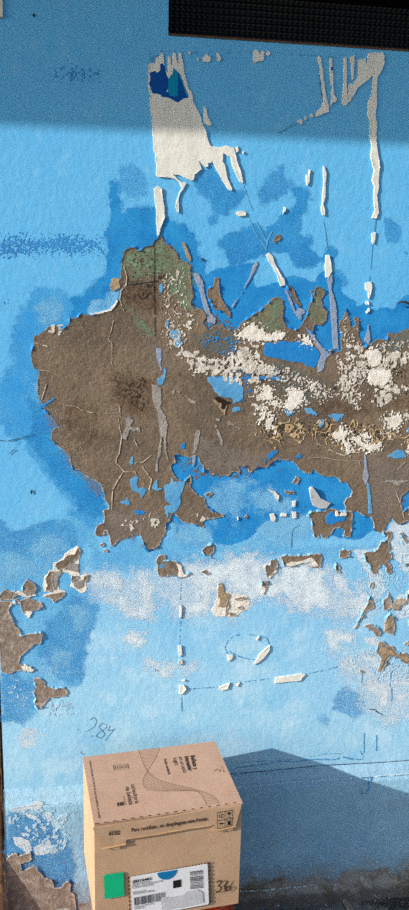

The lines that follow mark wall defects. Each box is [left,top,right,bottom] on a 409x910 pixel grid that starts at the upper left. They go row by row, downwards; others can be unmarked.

flaking render [0,177,409,725]
flaking render [2,800,77,910]